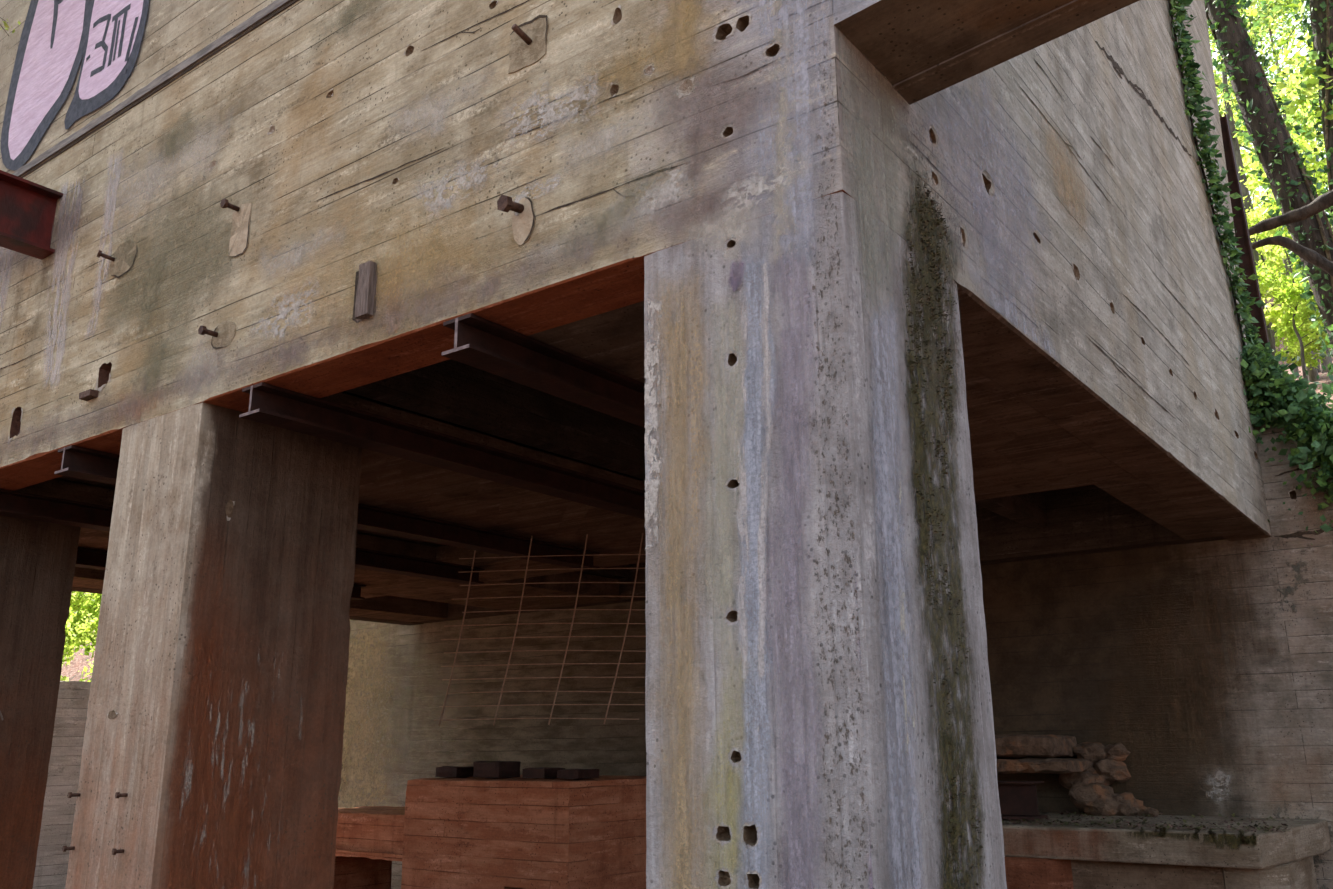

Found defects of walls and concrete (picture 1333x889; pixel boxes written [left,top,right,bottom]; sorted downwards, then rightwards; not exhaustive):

crack [1095,41,1191,156]
water stain [874,311,932,889]
water stain [943,736,963,889]